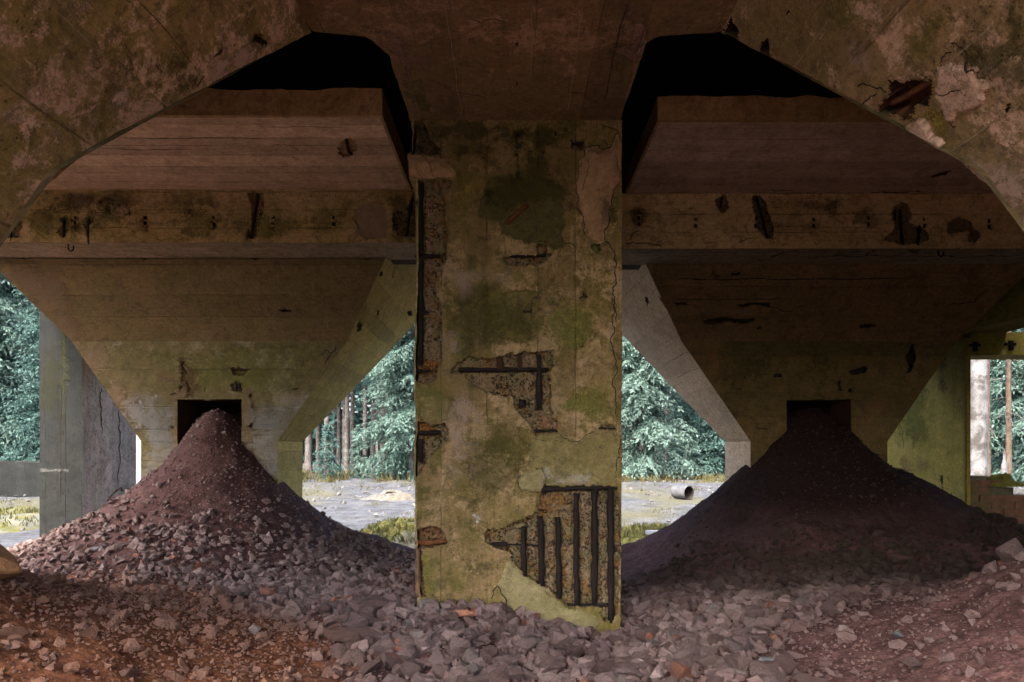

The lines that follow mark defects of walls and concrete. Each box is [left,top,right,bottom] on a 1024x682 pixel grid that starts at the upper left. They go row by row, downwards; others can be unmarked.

crack [857,83,887,105]
peeling [877,62,991,150]
crack [936,31,986,97]
crack [560,2,662,473]
spalling [752,195,775,240]
spalling [882,201,929,246]
spalling [947,217,981,243]
spalling [391,174,566,442]
spalling [414,422,450,477]
spalling [483,469,621,624]